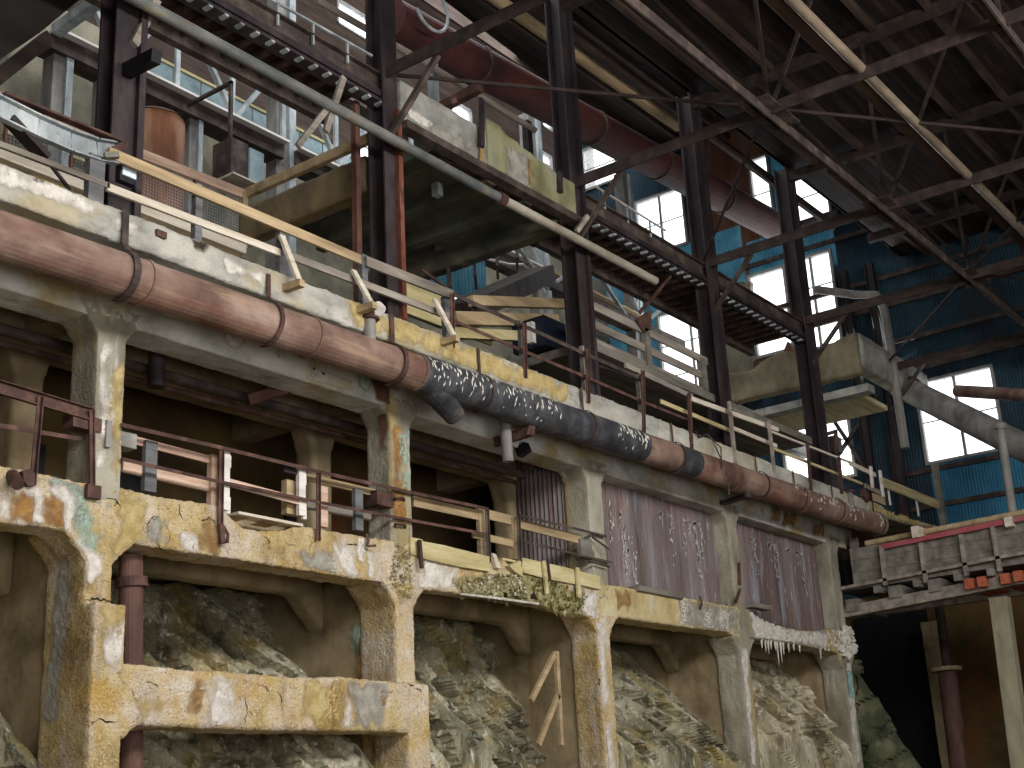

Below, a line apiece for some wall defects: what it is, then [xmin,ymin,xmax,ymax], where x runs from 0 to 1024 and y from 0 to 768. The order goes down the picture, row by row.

rust [371,378,409,523]
rust [10,491,65,527]
leakage [679,599,841,651]